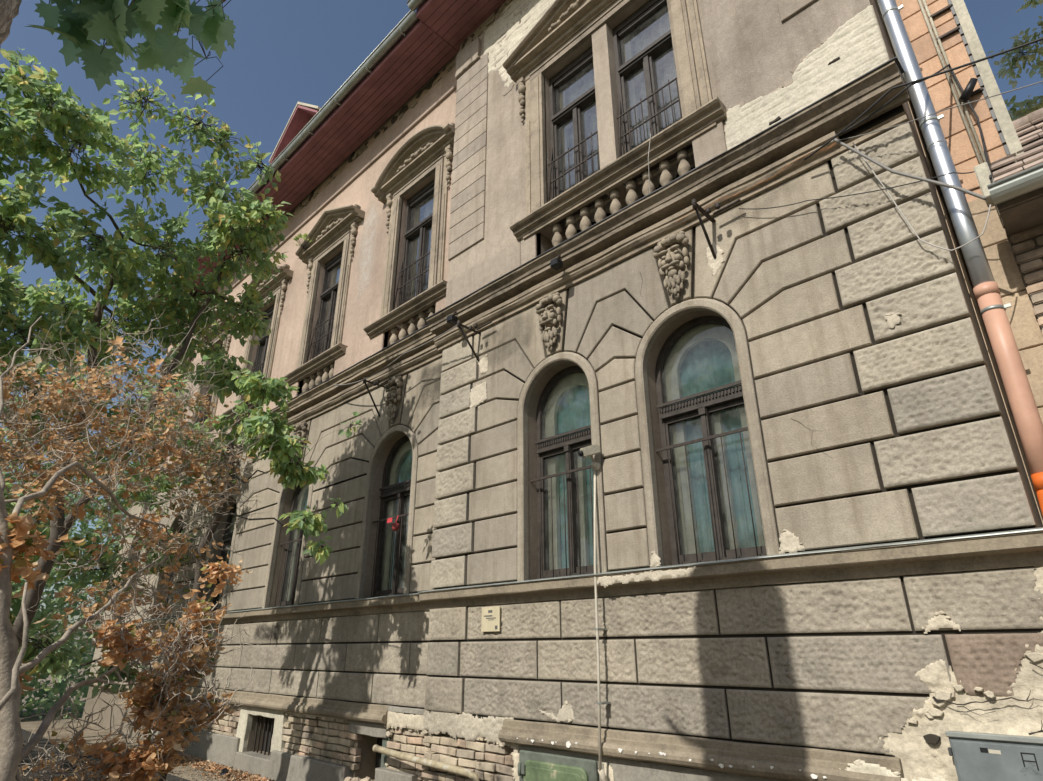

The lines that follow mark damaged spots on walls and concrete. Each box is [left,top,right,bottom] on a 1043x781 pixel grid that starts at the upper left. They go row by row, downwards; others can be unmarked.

flaking render [483,0,555,96]
flaking render [724,5,890,150]
flaking render [1034,565,1043,599]
flaking render [922,611,961,634]
flaking render [839,616,1043,781]
crack [932,662,1043,735]
flaking render [384,709,519,781]
flaking render [603,762,614,781]